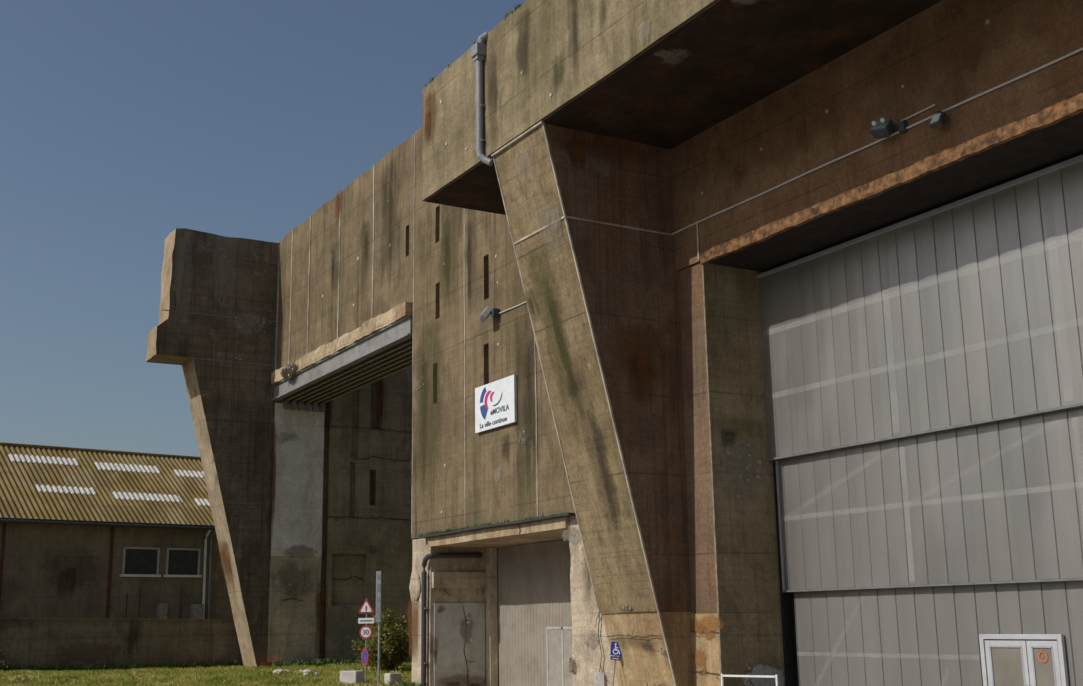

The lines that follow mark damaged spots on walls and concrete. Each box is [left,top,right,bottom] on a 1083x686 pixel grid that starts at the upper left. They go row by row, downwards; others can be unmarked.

rust [700,93,1083,265]
crack [444,588,476,685]
crack [596,612,660,681]